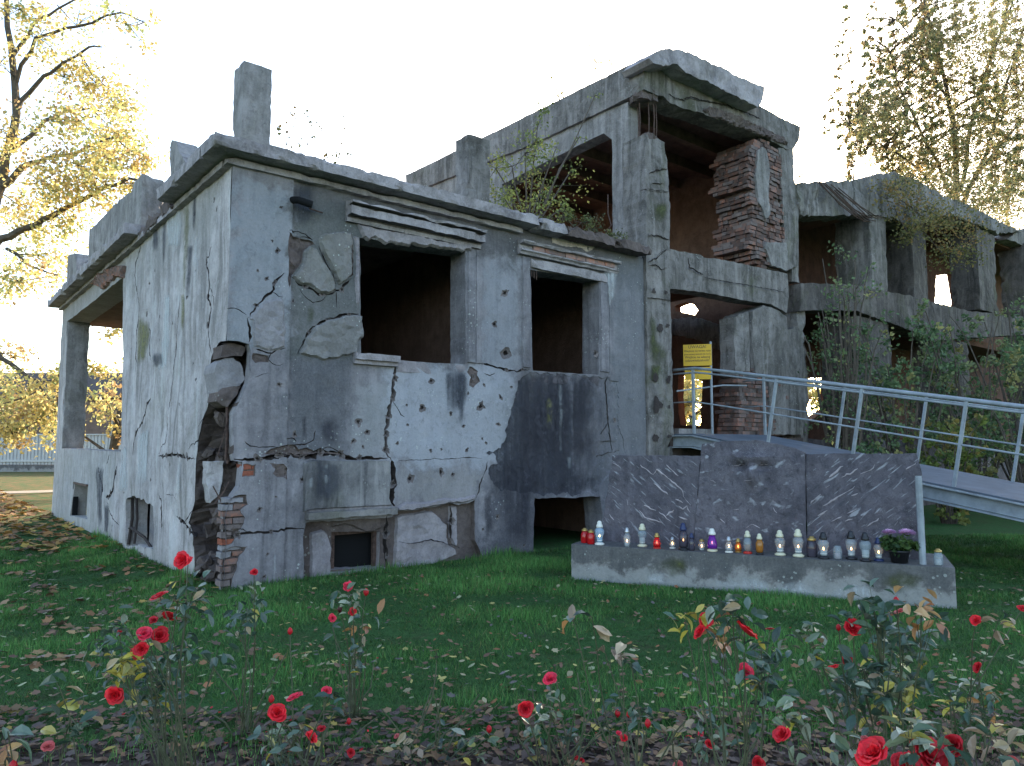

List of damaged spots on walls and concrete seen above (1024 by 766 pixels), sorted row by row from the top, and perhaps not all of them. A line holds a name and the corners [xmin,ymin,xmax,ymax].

spalling [288,233,314,287]
crack [98,230,487,590]
damp [448,373,465,417]
spalling [467,366,480,388]
spalling [215,495,248,590]